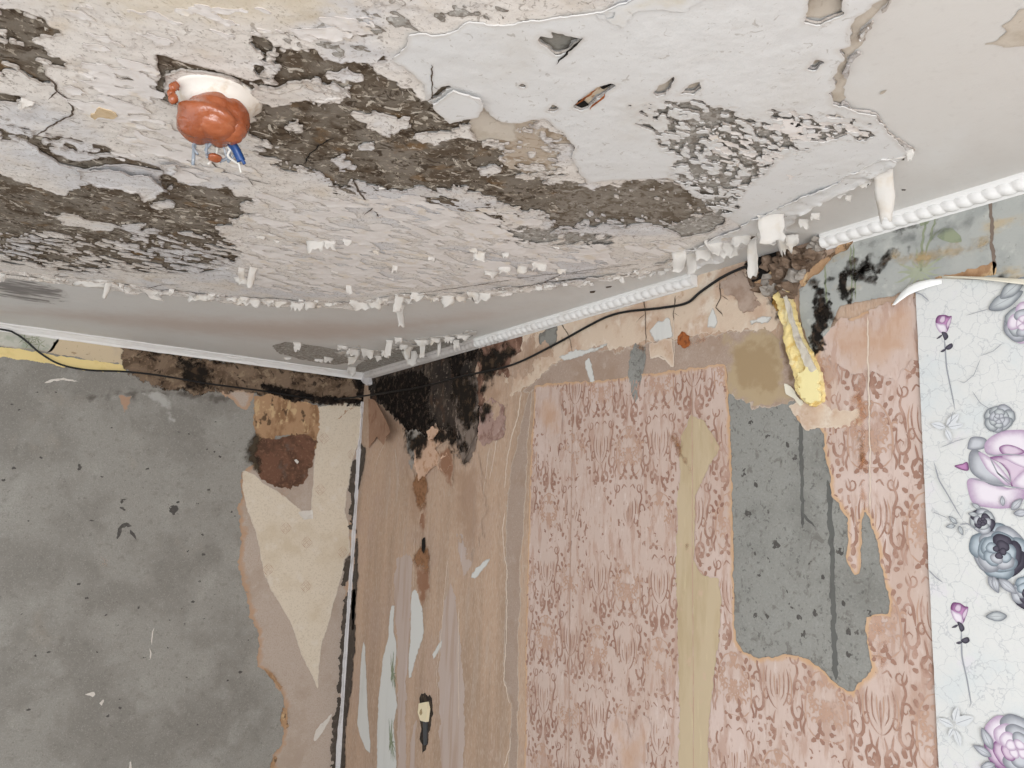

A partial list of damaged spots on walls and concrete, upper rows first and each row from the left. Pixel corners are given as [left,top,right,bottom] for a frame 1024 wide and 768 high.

crack [37,77,74,135]
peeling [0,0,915,407]
water stain [808,250,919,381]
flaking render [245,433,318,490]
water stain [80,333,554,562]
spalling [728,394,890,691]
spalling [419,693,433,754]